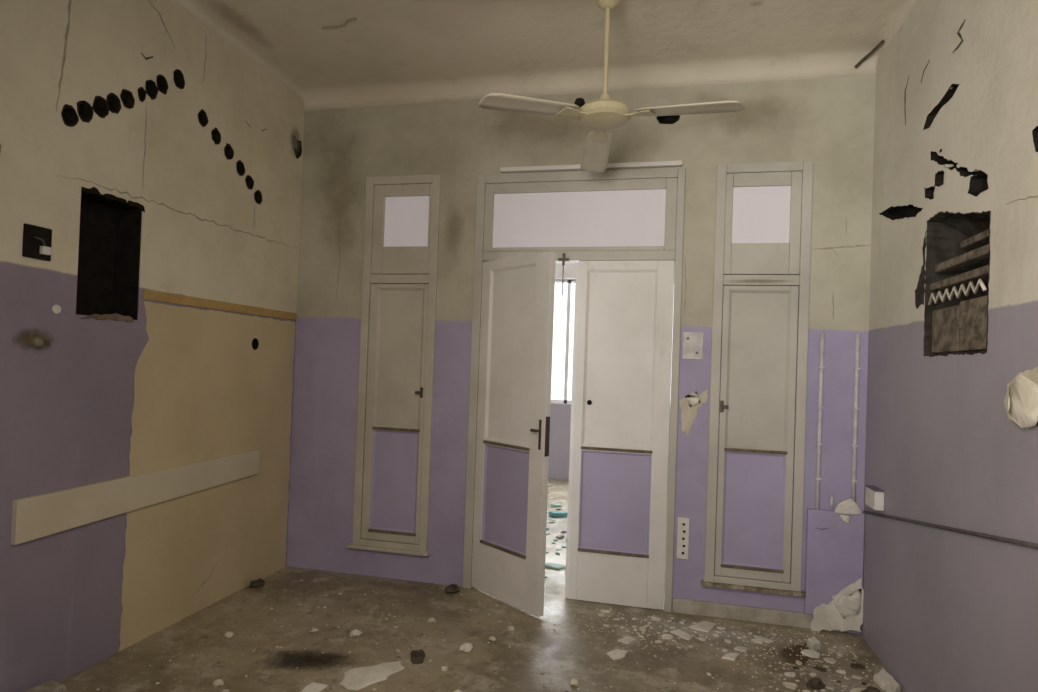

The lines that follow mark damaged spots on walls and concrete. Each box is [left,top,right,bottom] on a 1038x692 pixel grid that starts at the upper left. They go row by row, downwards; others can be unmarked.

crack [56,0,72,112]
spalling [923,84,959,130]
spalling [879,149,989,220]
peeling [679,389,708,436]
peeling [1004,367,1038,430]
flaking render [834,498,862,524]
flaking render [811,578,864,632]